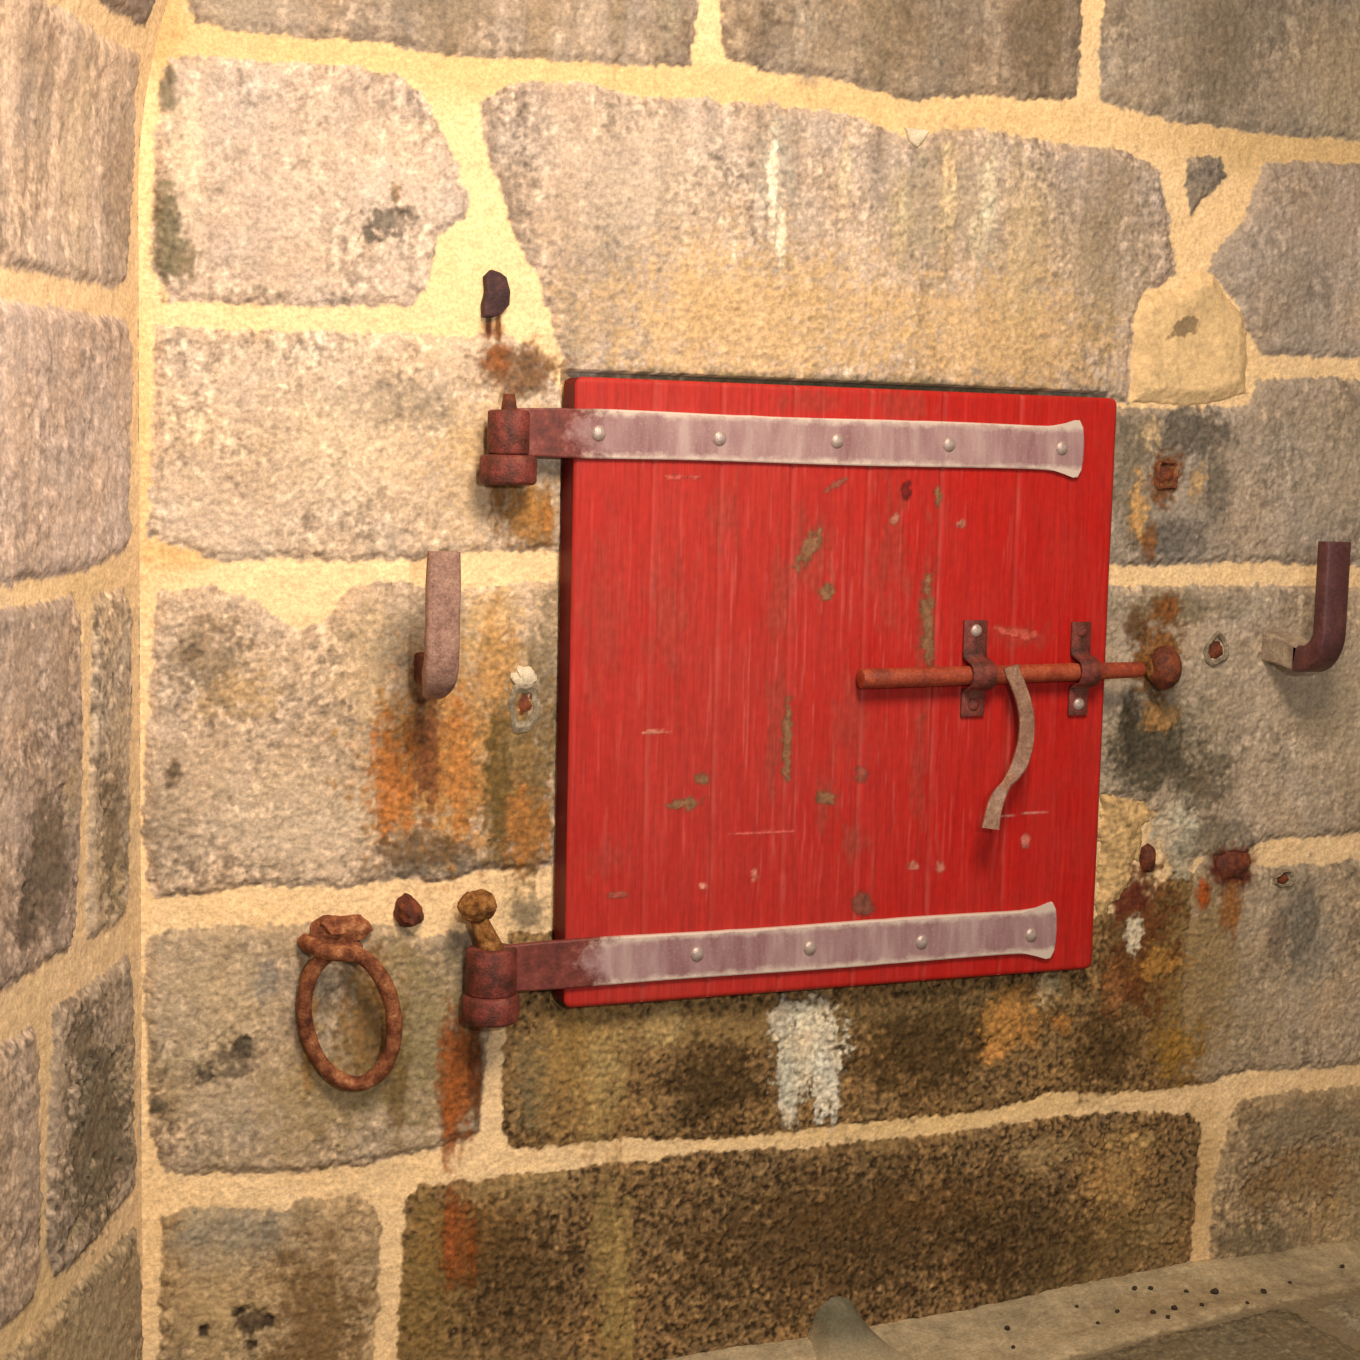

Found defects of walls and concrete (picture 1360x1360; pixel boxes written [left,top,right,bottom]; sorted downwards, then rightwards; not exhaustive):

corrosion [482,315,565,396]
corrosion [491,485,554,549]
corrosion [1129,415,1205,560]
corrosion [1124,594,1182,731]
corrosion [346,596,556,890]
corrosion [1198,845,1254,933]
corrosion [1093,864,1204,1085]
corrosion [435,1015,483,1168]
damp [1072,1016,1137,1085]
damp [568,993,989,1360]